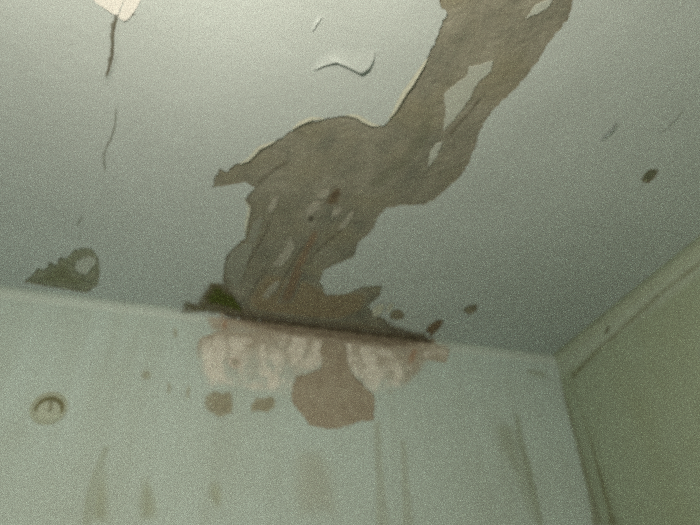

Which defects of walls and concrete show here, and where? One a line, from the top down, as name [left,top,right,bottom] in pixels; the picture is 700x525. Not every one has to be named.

crack [94,0,140,85]
crack [102,100,118,178]
peeling [213,0,572,326]
peeling [25,248,100,292]
water stain [177,278,450,402]
spalling [425,319,443,337]